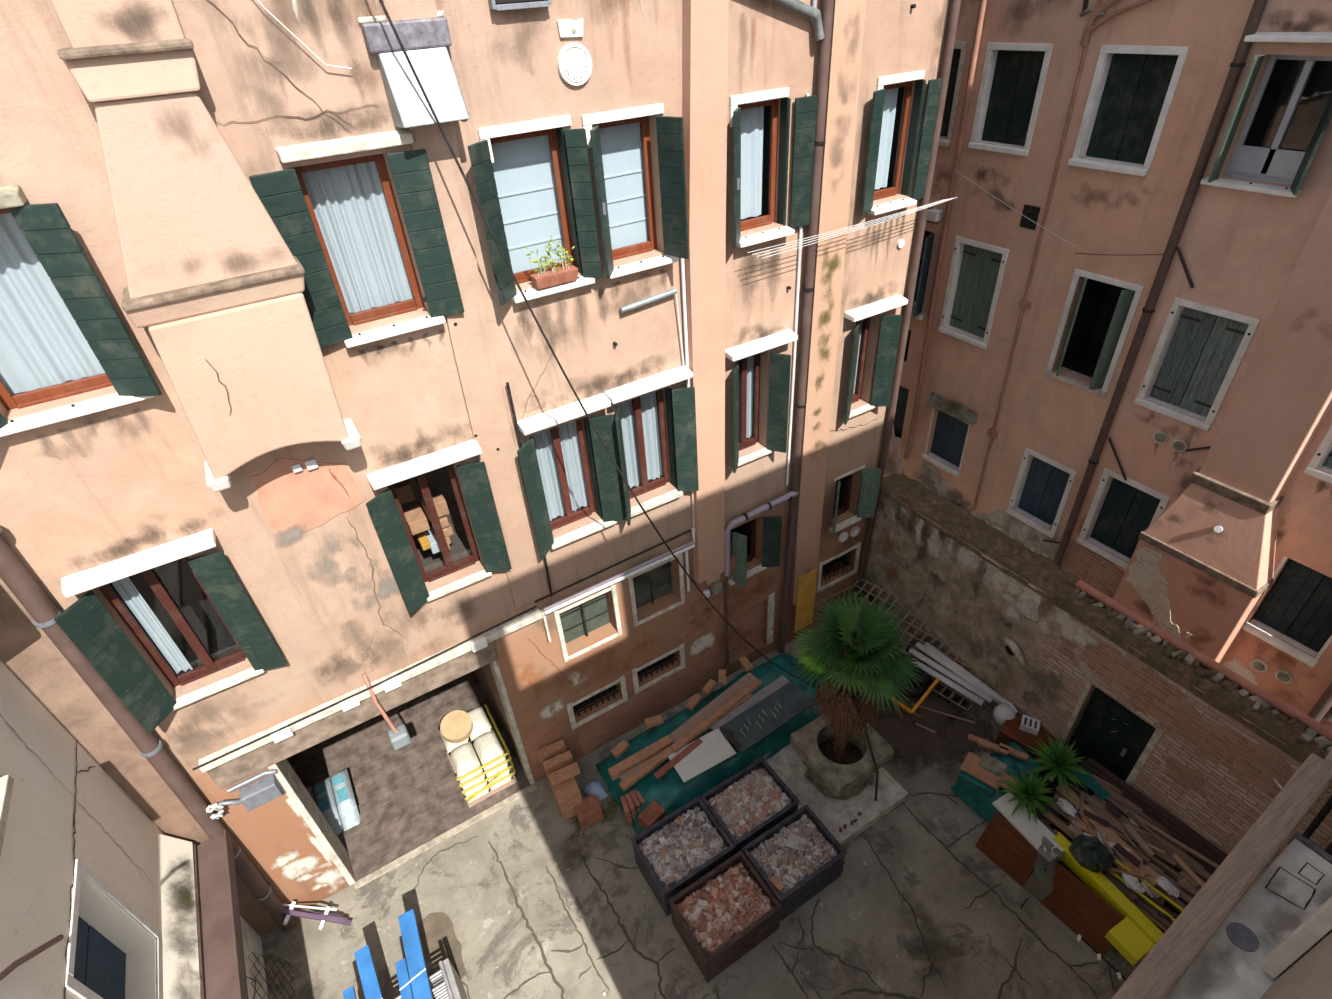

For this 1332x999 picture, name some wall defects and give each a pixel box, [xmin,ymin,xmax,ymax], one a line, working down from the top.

crack [208,0,378,133]
crack [205,359,231,413]
peeling [1049,515,1192,639]
crack [0,714,156,999]
crack [413,837,675,999]
crack [772,835,947,999]
crack [902,792,1117,999]